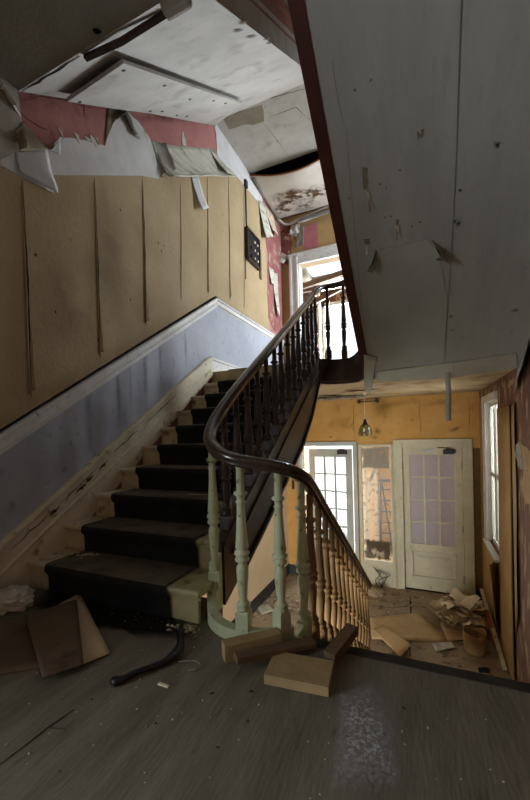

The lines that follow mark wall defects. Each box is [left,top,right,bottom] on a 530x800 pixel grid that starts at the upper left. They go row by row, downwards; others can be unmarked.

peeling [18,92,107,150]
peeling [129,111,215,150]
spalling [223,105,305,158]
leakage [275,188,325,211]
peeling [259,200,318,332]
crack [12,397,174,549]
flaking render [515,440,530,505]